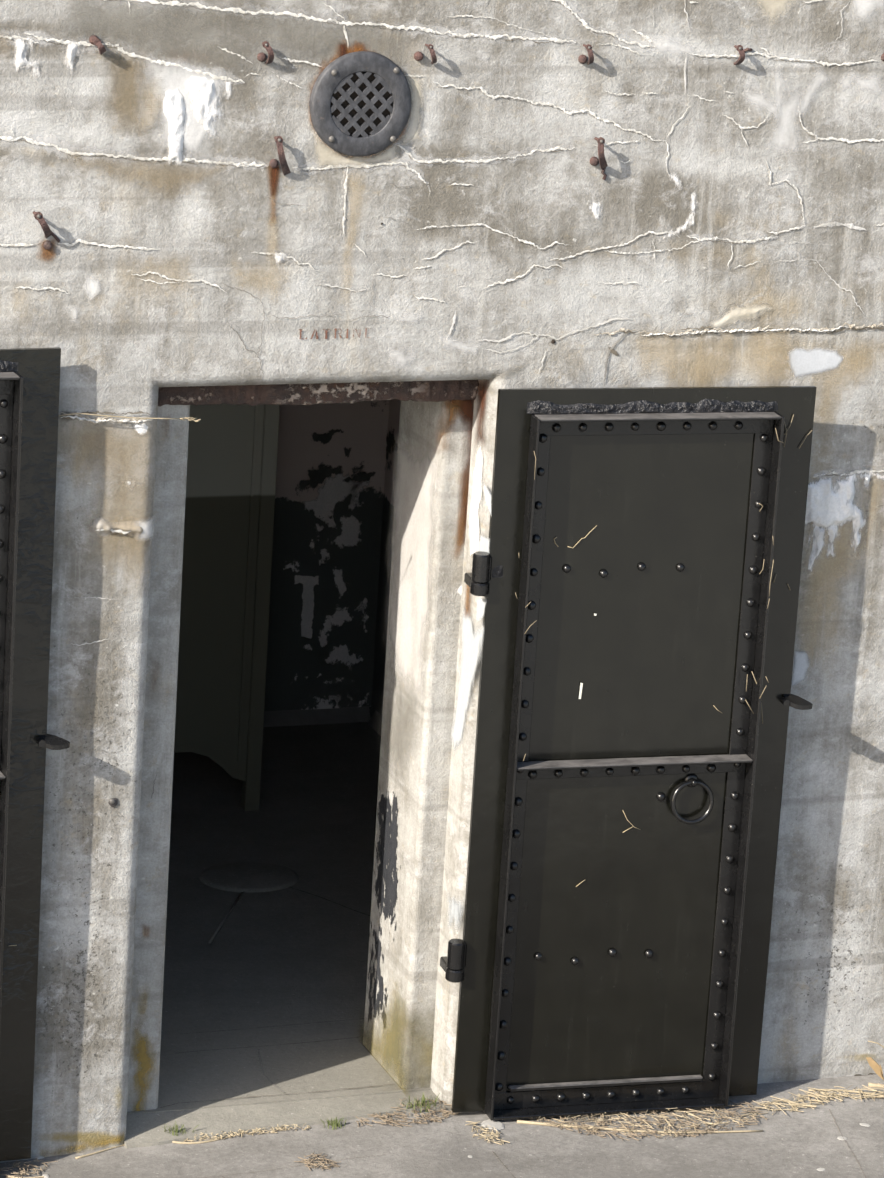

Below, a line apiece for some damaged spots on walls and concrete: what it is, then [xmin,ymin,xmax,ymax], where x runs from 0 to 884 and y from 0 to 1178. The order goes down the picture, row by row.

corrosion [269,167,278,222]
crack [0,0,884,386]
spalling [594,322,884,356]
peeling [295,429,398,710]
corrosion [446,380,487,551]
peeling [368,792,398,1030]